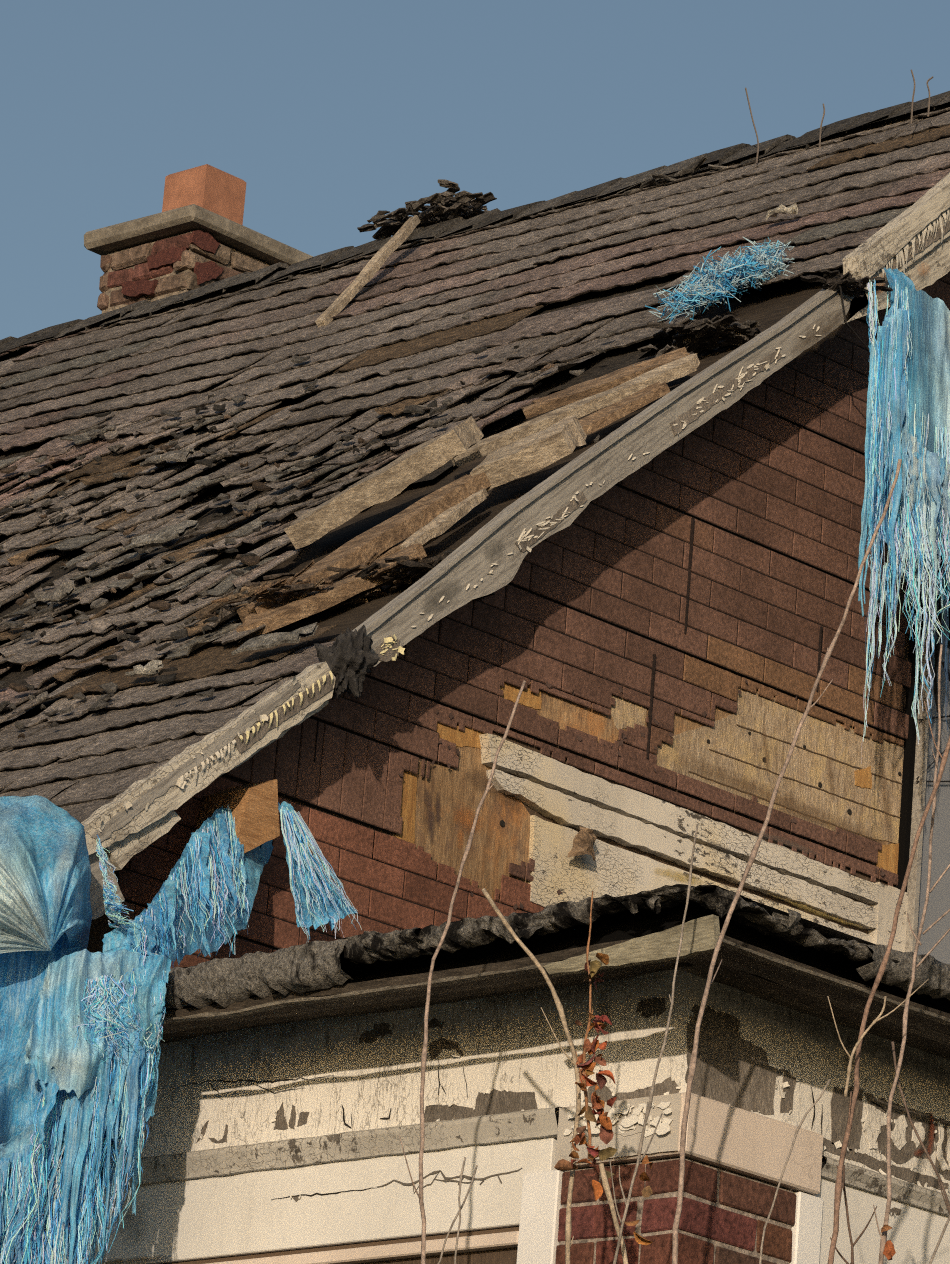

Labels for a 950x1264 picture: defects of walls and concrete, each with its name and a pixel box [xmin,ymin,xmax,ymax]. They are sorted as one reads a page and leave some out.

peeling [91,671,333,842]
peeling [359,1022,393,1045]
peeling [422,1018,463,1059]
peeling [564,1004,799,1143]
peeling [271,1102,309,1130]
peeling [424,1088,538,1123]
peeling [822,1085,950,1192]
crack [271,1168,521,1200]